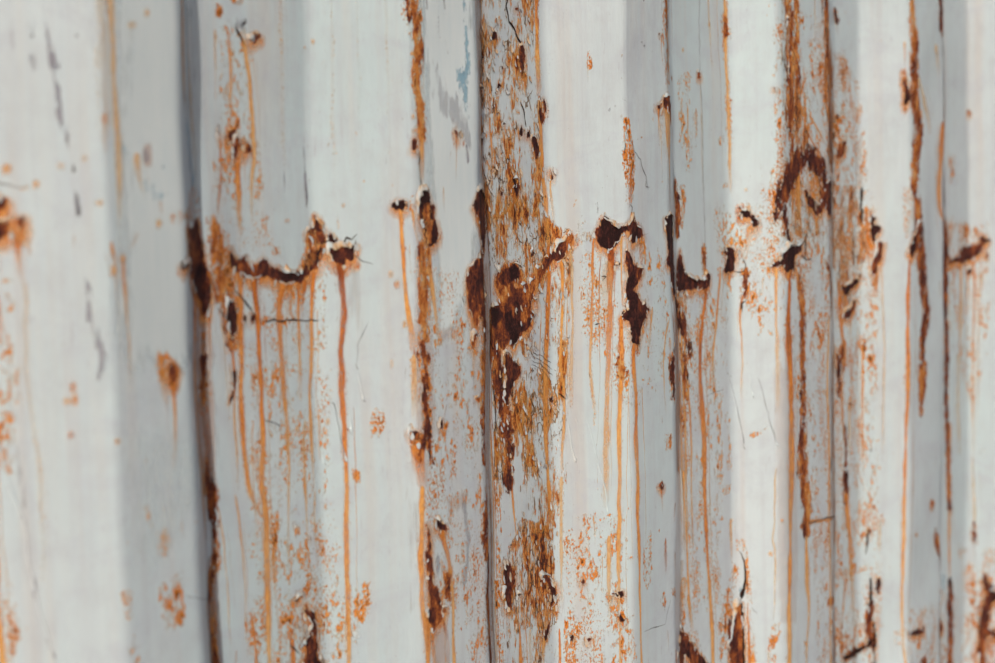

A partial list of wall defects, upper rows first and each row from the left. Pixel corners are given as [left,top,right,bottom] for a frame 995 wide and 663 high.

corrosion [0,334,18,474]
corrosion [0,585,21,663]
corrosion [0,193,31,252]
corrosion [155,187,225,663]
corrosion [219,77,263,201]
corrosion [229,213,372,663]
corrosion [370,408,385,438]
peeling [480,0,574,663]
corrosion [389,0,884,663]
corrosion [895,0,995,663]